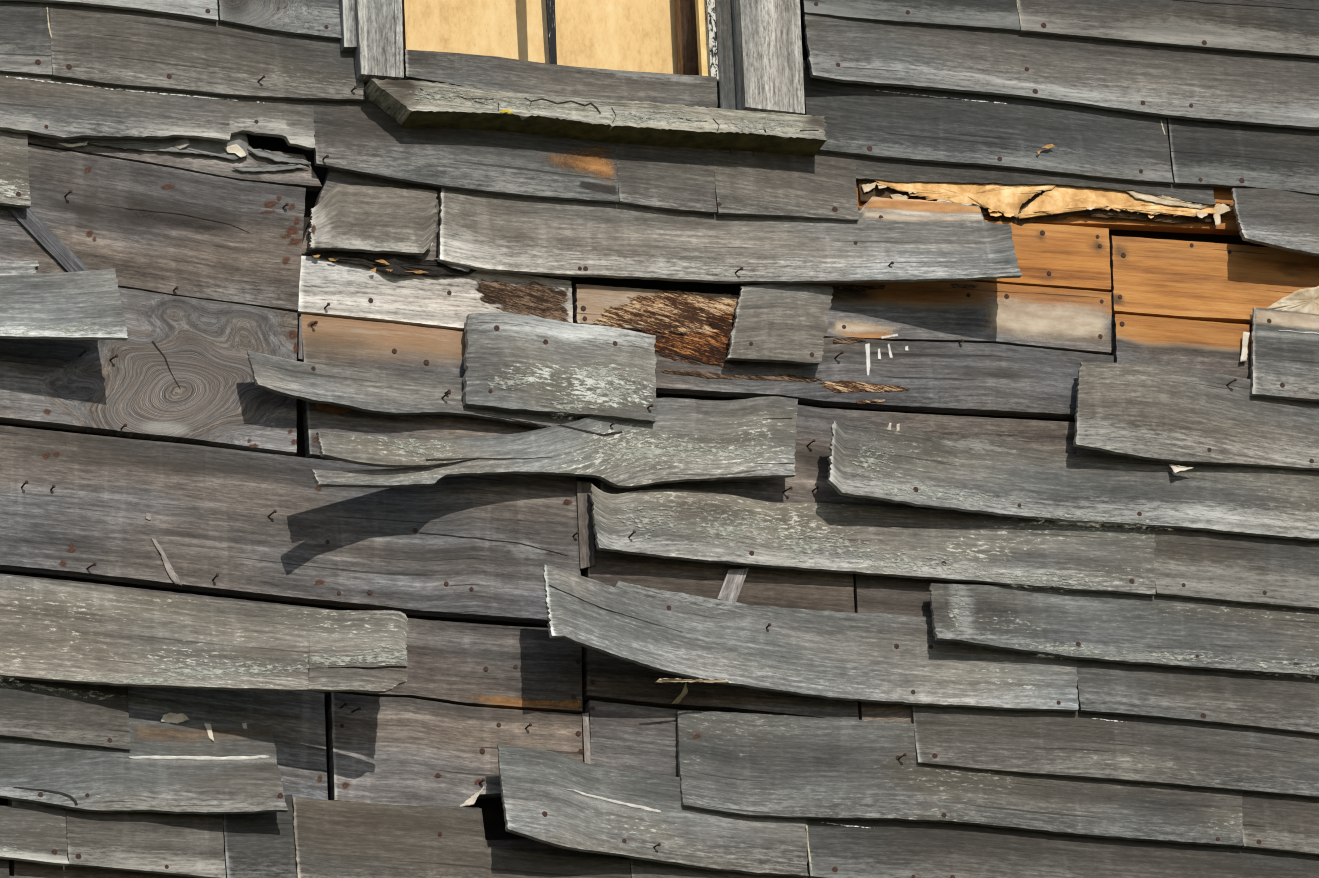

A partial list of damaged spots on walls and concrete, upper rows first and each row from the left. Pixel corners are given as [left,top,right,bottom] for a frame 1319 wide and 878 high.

peeling [861,201,983,220]